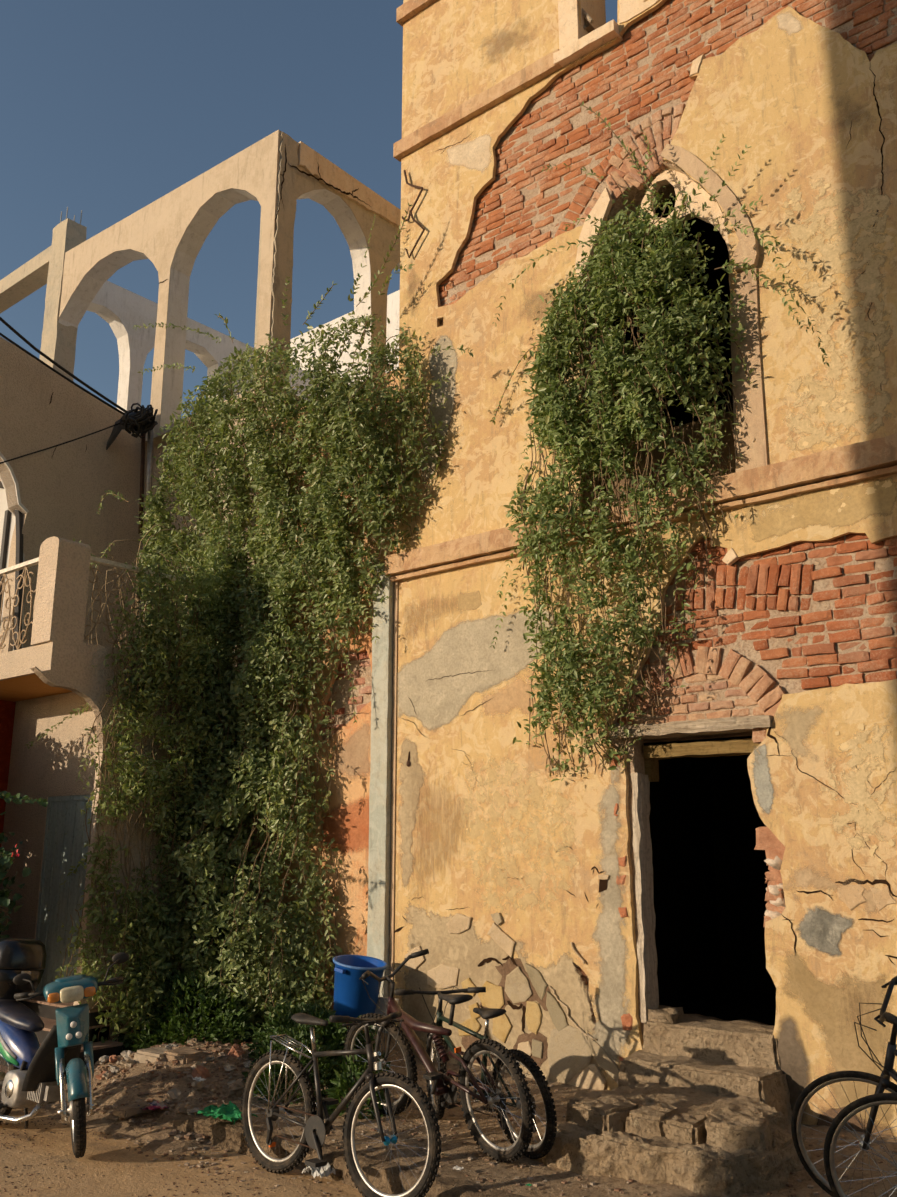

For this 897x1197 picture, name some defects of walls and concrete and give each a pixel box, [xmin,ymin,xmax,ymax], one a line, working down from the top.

crack [274,144,370,237]
flaking render [439,0,897,307]
crack [846,72,885,229]
flaking render [616,533,897,862]
spalling [754,826,786,927]
crack [767,727,897,966]
spalling [837,884,897,911]
spalling [401,903,623,1090]